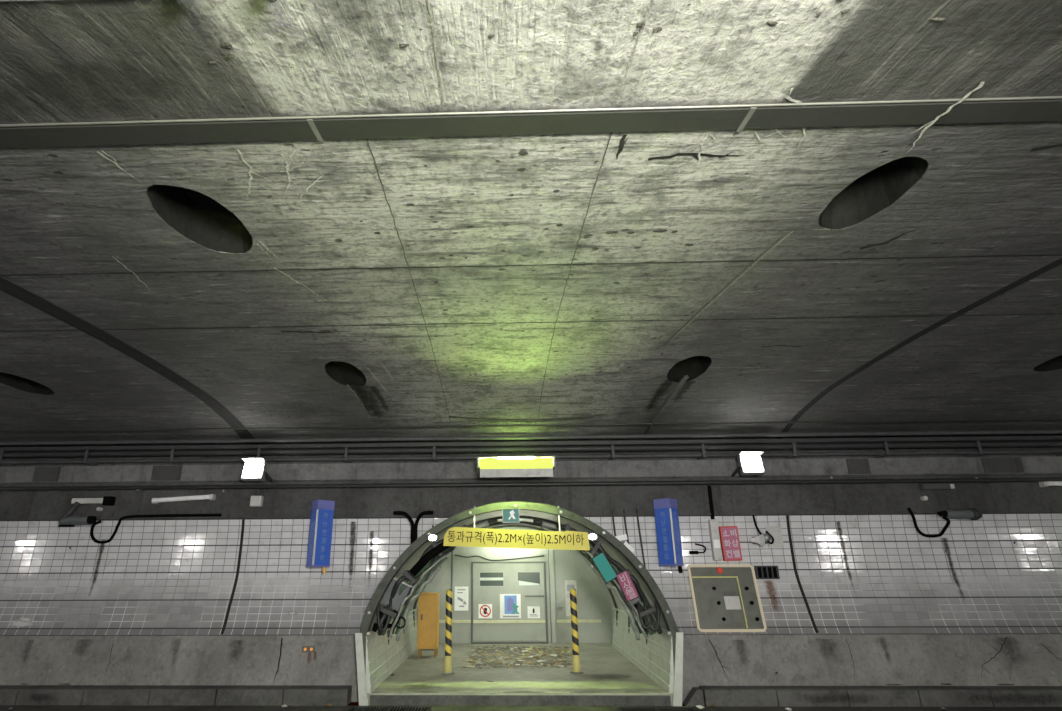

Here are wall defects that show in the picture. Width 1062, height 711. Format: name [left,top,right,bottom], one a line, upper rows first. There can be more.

crack [616,134,629,158]
crack [648,88,806,165]
crack [907,82,984,153]
damp [837,521,851,579]
damp [943,538,963,594]